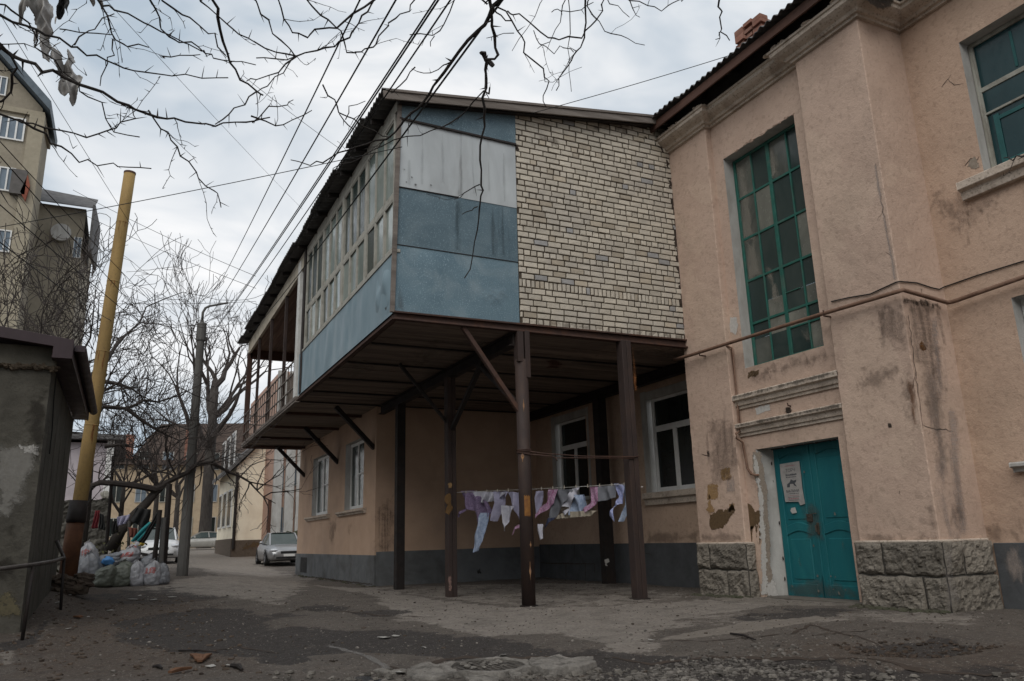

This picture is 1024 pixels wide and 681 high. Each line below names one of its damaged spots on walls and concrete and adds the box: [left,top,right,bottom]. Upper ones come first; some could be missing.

crack [908,315,948,431]
peeling [706,495,735,530]
peeling [748,439,838,596]